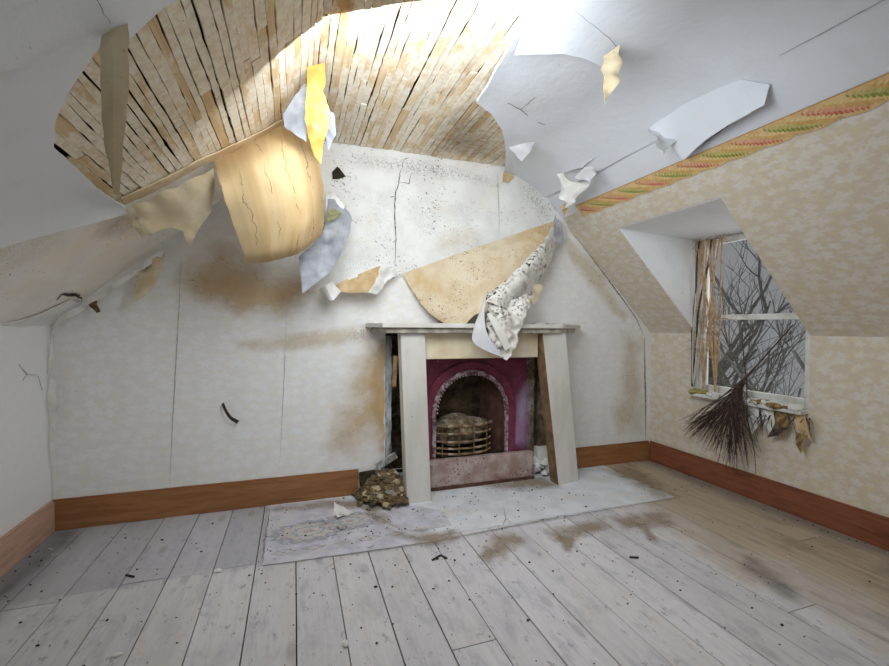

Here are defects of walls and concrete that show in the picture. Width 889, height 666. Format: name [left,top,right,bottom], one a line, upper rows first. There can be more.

crack [783,0,883,54]
flaking render [332,166,346,179]
peeling [509,142,535,161]
crack [392,158,411,257]
water stain [197,268,301,307]
water stain [355,347,386,428]